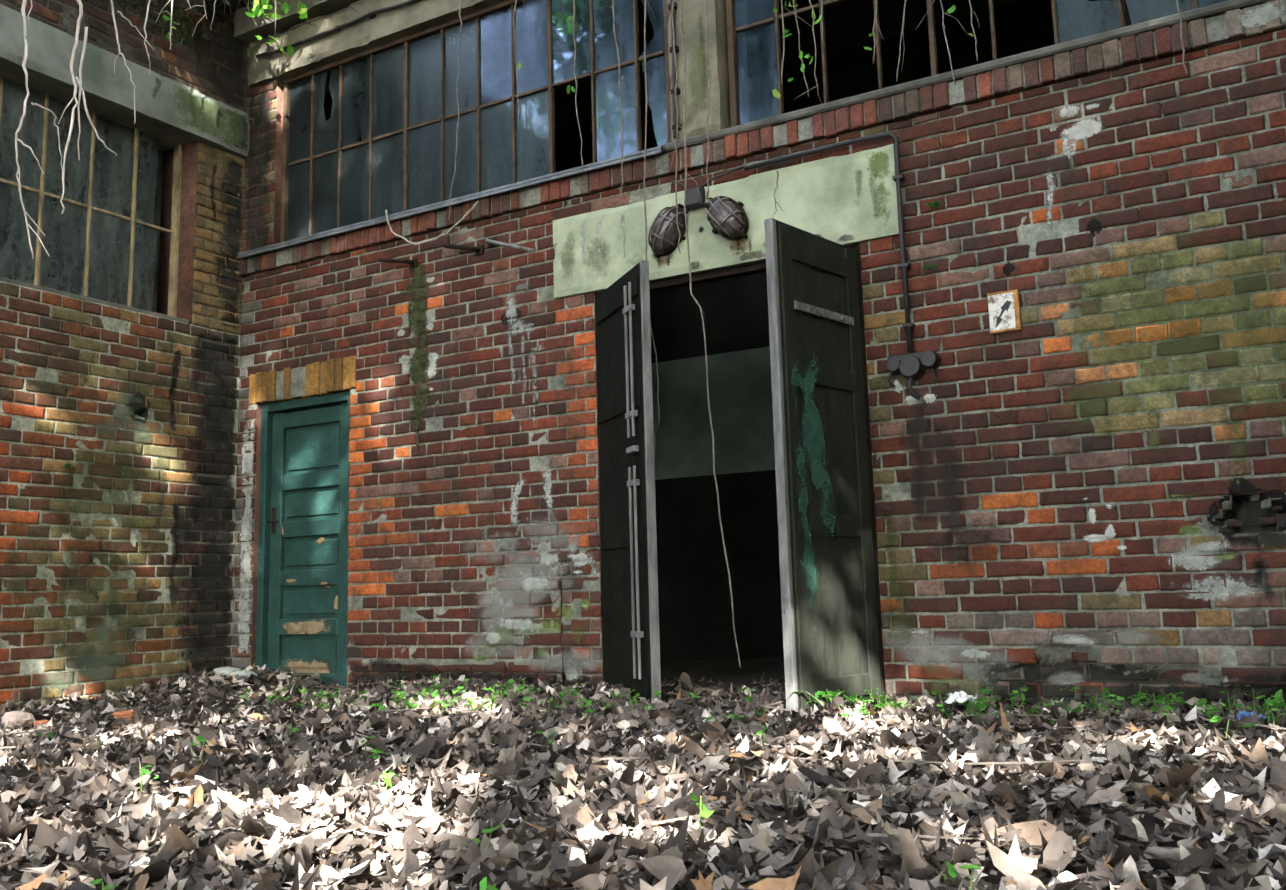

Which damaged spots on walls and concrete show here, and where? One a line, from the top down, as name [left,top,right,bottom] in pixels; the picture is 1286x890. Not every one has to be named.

flaking render [1049,104,1102,157]
flaking render [1046,172,1055,229]
leakage [506,284,543,418]
leakage [464,470,602,680]
leakage [1169,499,1286,601]
peeling [285,660,330,677]
leakage [888,626,1022,682]
leakage [1034,628,1156,650]